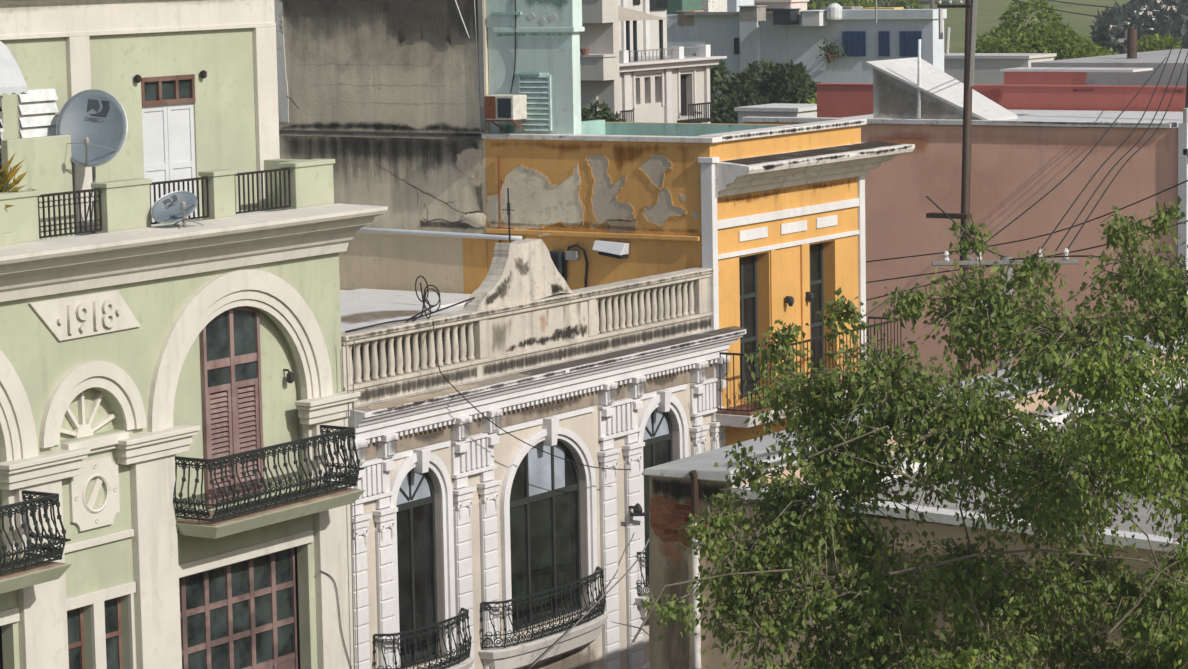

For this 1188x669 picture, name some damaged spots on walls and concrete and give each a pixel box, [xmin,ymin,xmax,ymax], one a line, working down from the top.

water stain [283,0,478,31]
water stain [279,123,483,162]
crack [376,164,480,223]
peeling [456,147,698,237]
water stain [341,260,713,339]
water stain [354,319,747,414]
spalling [649,495,717,548]